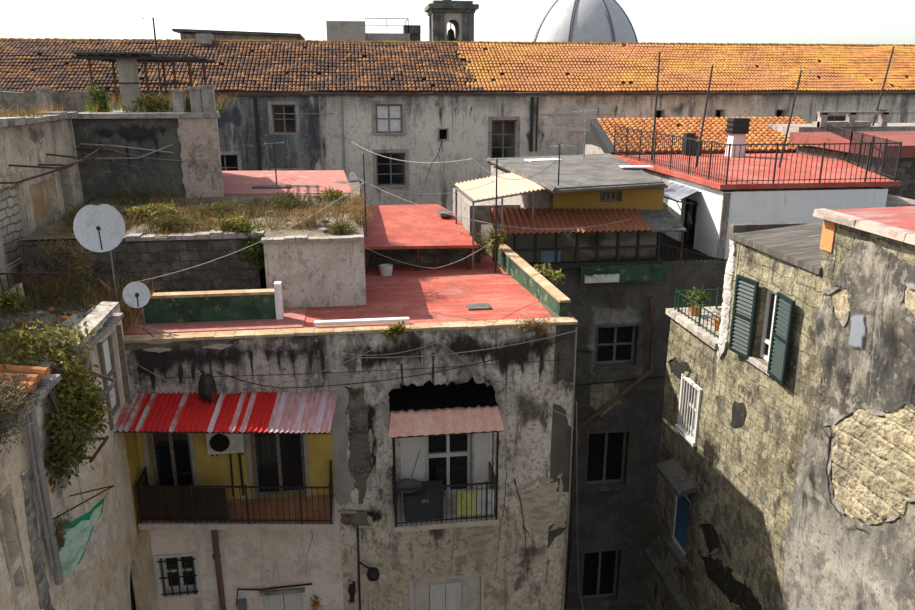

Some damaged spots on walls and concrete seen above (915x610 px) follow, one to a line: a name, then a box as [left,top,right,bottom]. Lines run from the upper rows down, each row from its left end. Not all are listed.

water stain [136,341,325,390]
water stain [361,338,439,387]
water stain [450,334,559,387]
spalling [667,357,693,379]
water stain [879,322,898,369]
spalling [730,401,747,428]
flaking render [338,383,375,529]
flaking render [823,402,915,526]
spalling [696,519,762,610]